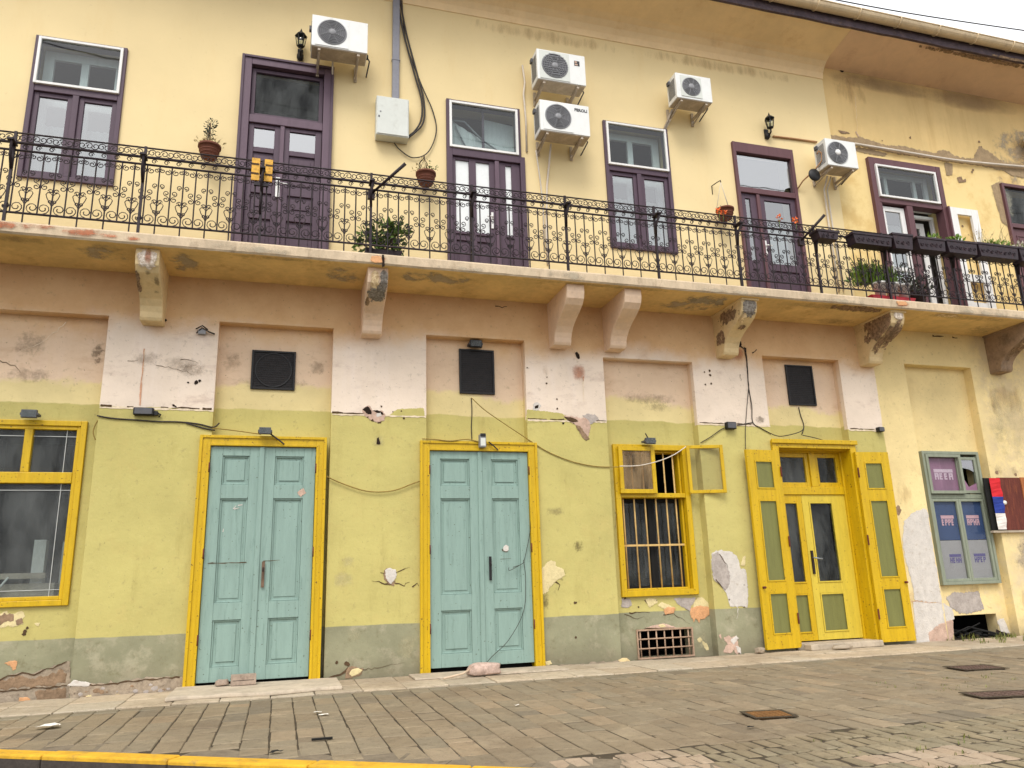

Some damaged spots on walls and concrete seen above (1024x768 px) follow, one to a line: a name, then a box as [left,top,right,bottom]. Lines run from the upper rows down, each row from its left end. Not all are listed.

damp [991,182,1012,226]
peeling [365,255,388,306]
peeling [716,300,757,346]
spalling [864,312,903,354]
peeling [374,567,419,587]
peeling [542,560,565,594]
peeling [711,550,748,617]
peeling [896,505,984,643]
peeling [0,611,40,636]
peeling [621,597,709,629]
flaking render [0,660,183,702]
flaking render [328,661,406,679]